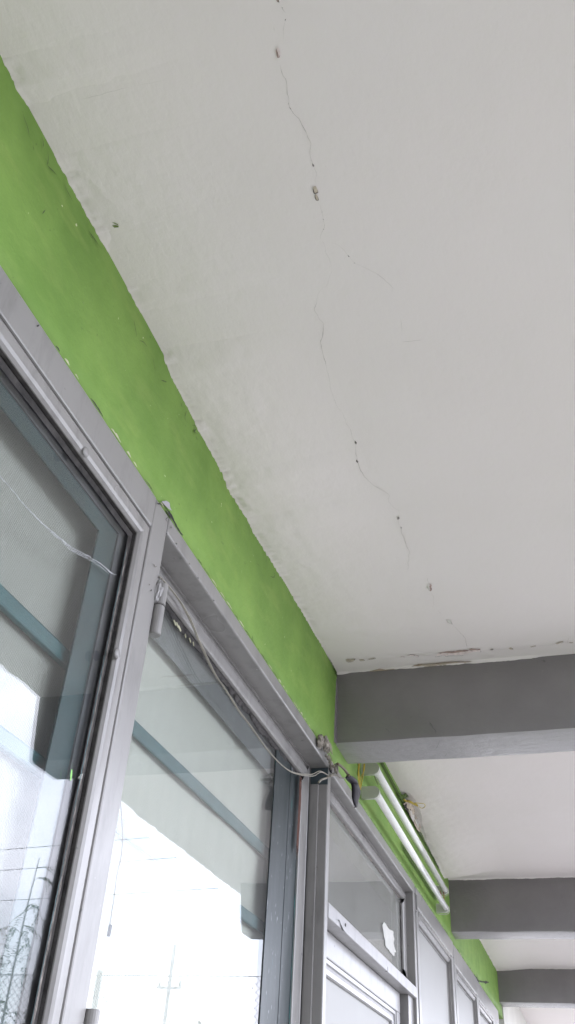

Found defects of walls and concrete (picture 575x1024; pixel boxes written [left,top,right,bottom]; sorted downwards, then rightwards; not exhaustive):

peeling [401,648,492,667]